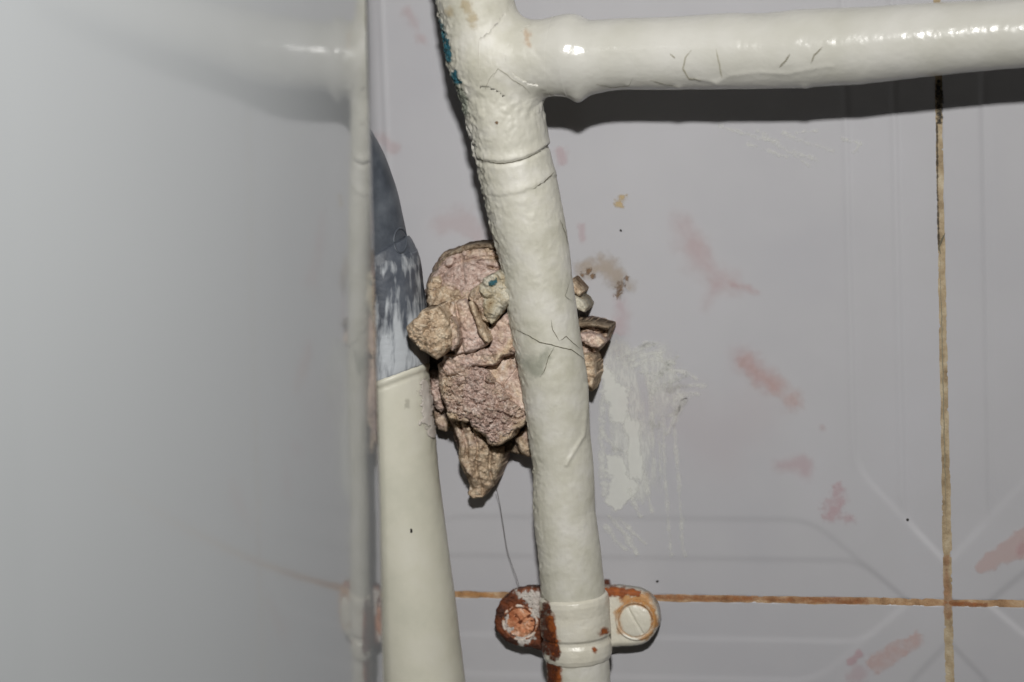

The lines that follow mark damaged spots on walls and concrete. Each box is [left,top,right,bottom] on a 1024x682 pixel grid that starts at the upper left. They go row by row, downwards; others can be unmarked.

crack [601,51,722,88]
crack [512,322,585,374]
rust [604,579,659,640]
rust [540,601,562,682]